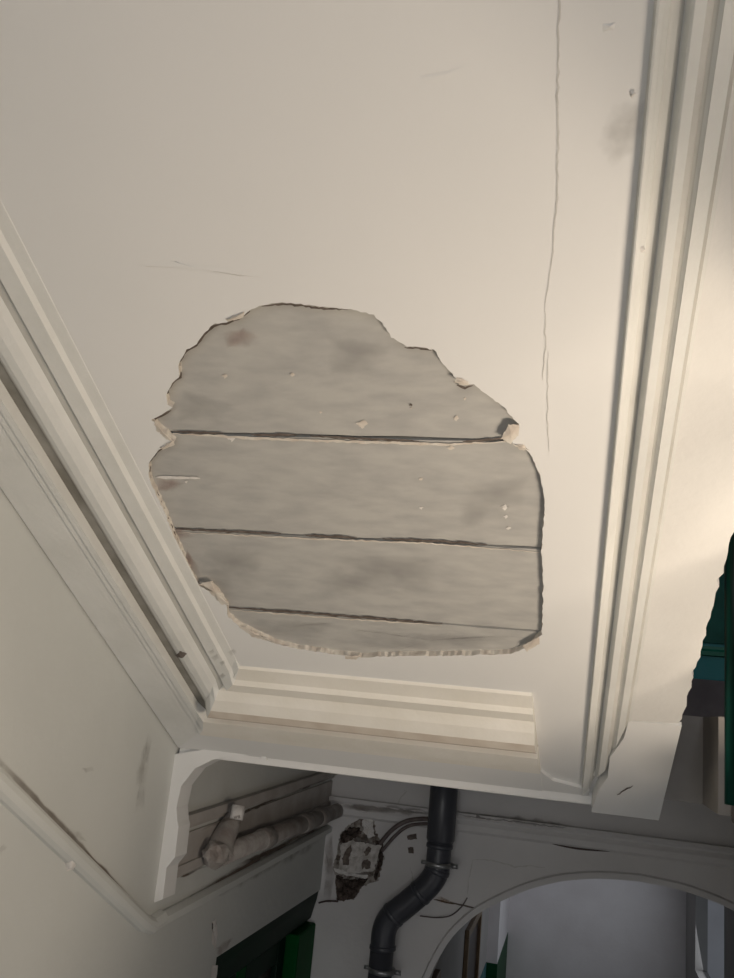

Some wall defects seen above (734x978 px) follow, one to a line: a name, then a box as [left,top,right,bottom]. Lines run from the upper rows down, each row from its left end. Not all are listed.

crack [542,0,561,447]
flaking render [150,302,545,660]
flaking render [333,819,385,902]